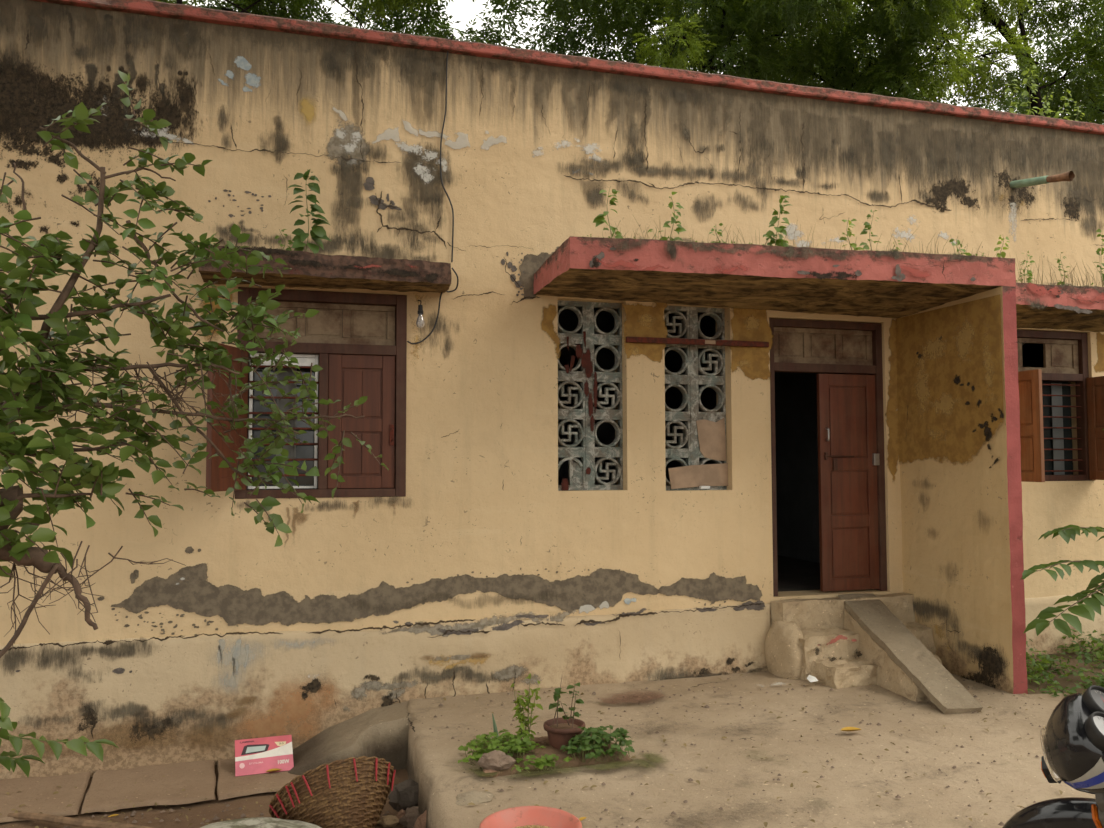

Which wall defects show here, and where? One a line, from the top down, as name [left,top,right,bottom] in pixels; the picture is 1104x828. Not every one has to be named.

damp [0,0,203,208]
crack [123,47,401,203]
peeling [335,127,400,165]
damp [564,70,806,209]
damp [788,111,1104,239]
crack [375,192,540,303]
spalling [501,252,524,296]
peeling [973,408,1004,468]
damp [3,638,150,676]
crack [0,619,490,651]
peeling [97,546,765,637]
crack [521,603,764,657]